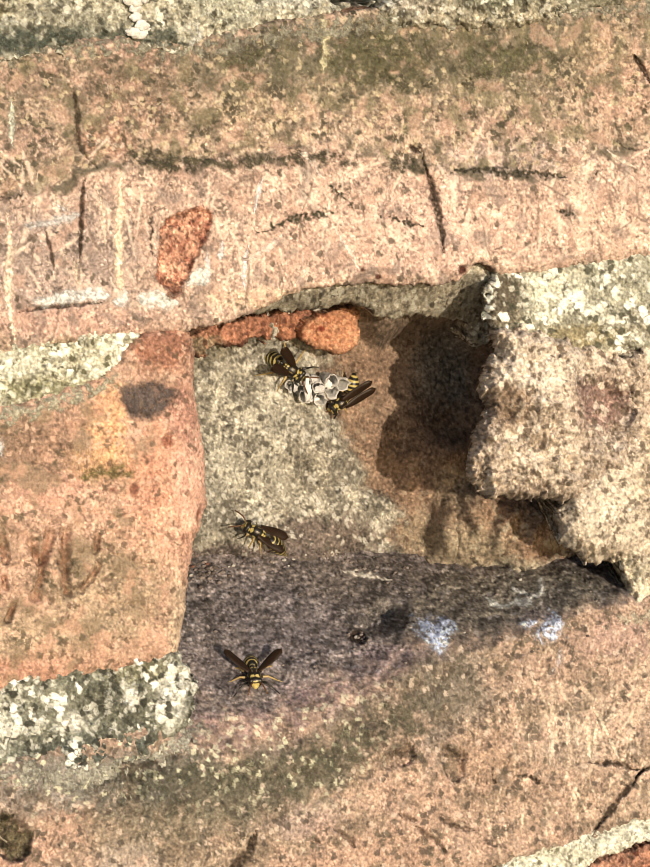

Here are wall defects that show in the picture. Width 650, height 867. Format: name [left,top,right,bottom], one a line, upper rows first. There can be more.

damp [123,0,154,40]
crack [634,54,650,81]
crack [73,93,89,259]
crack [380,146,566,253]
crack [46,234,54,267]
spalling [350,631,366,644]
crack [492,769,543,784]
crack [588,761,650,830]